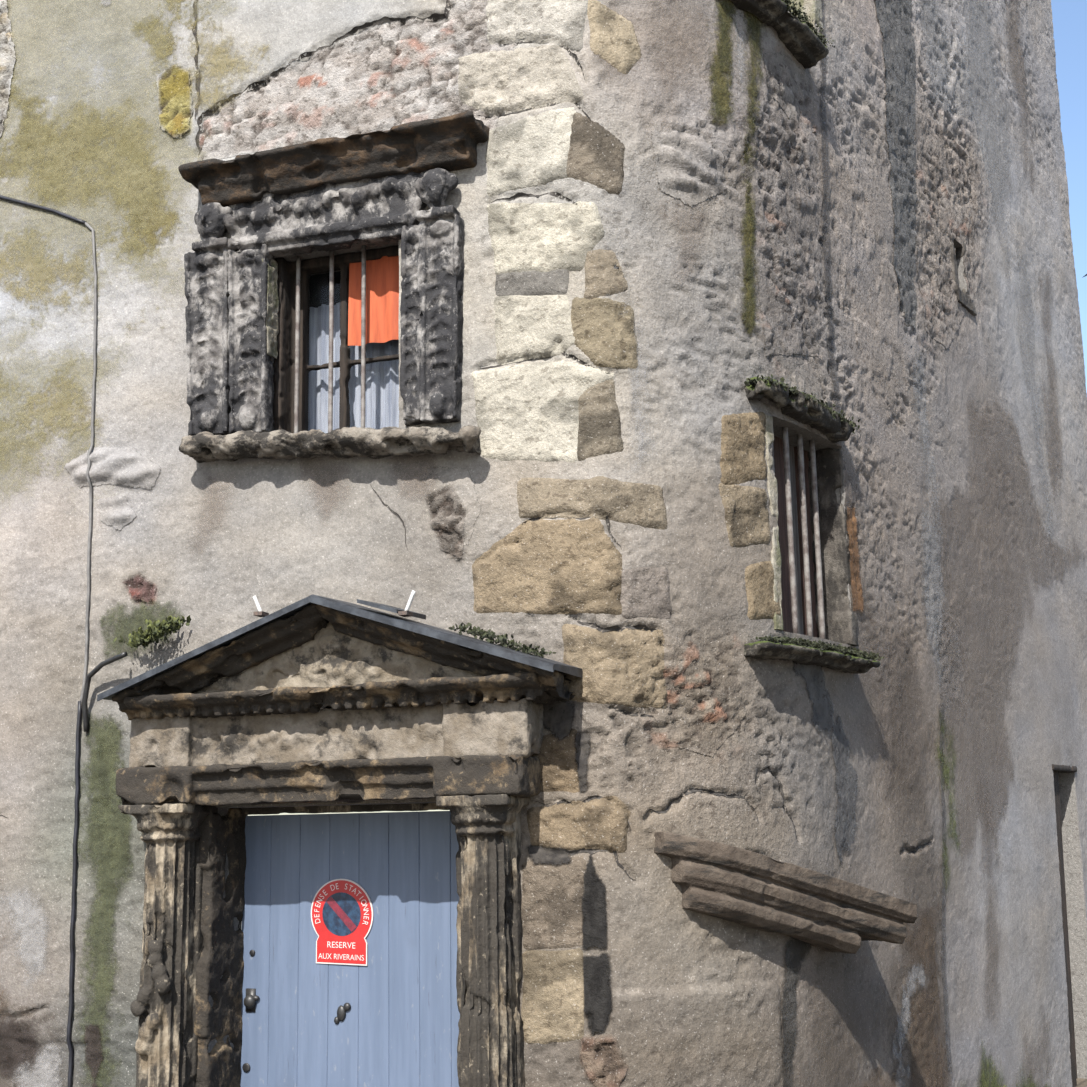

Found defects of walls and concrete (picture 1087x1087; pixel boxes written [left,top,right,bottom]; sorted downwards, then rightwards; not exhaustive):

flaking render [0,0,16,137]
flaking render [156,0,517,161]
leakage [738,9,763,333]
leakage [922,0,1009,236]
leakage [923,518,961,708]
crack [535,795,603,807]
crack [565,766,802,881]
leakage [11,897,45,970]
crack [0,1005,44,1018]
leakage [0,991,59,1087]
flaking render [582,1035,628,1087]